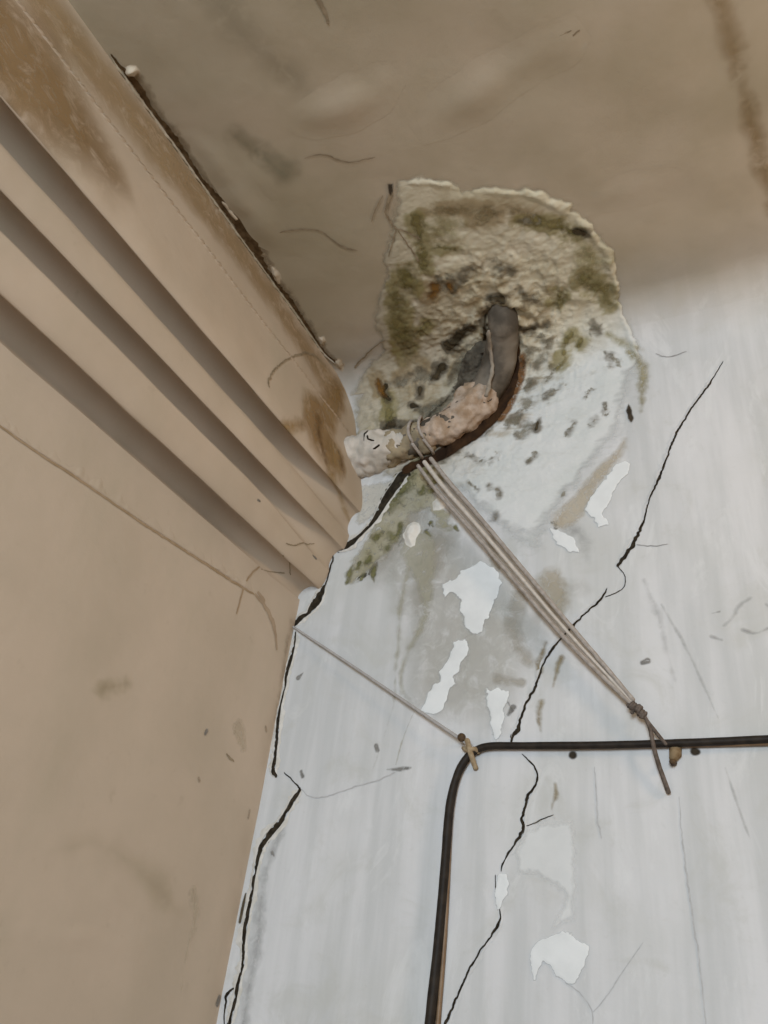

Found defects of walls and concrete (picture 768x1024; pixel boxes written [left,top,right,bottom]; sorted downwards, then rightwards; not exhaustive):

leakage [0,0,111,170]
leakage [34,0,336,393]
crack [110,54,386,387]
spalling [352,177,641,552]
leakage [621,341,647,403]
leakage [345,459,459,601]
leakage [555,455,617,527]
crack [223,471,411,1024]
peeling [421,561,502,714]
peeling [486,688,509,740]
crack [444,361,723,1024]
peeling [517,824,589,984]